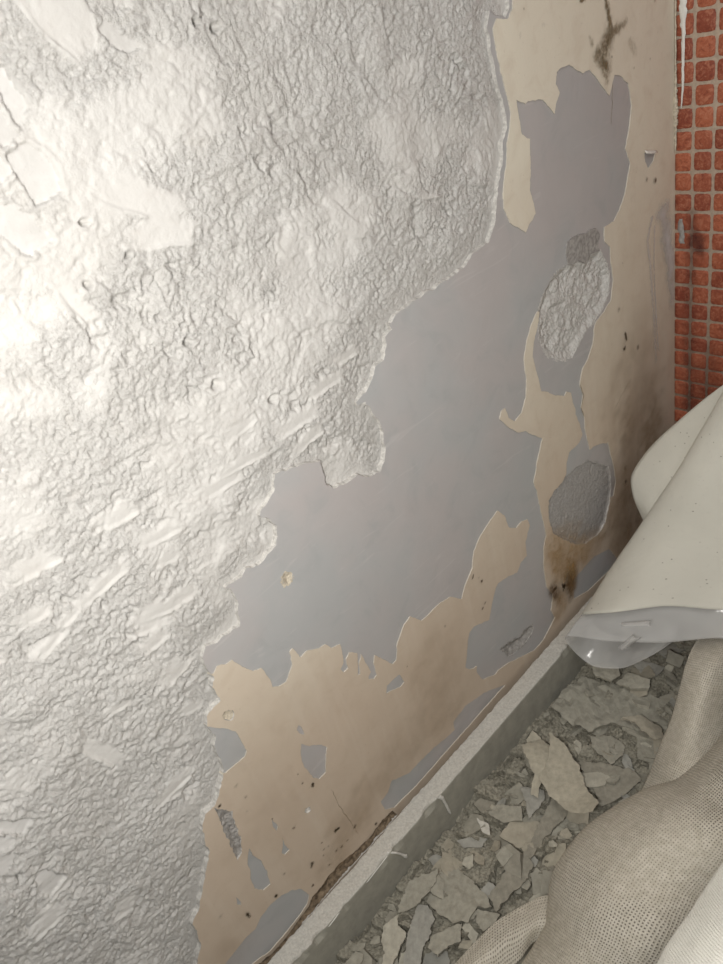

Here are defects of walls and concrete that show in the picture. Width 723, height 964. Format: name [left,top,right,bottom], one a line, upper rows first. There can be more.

spalling [0,0,505,964]
peeling [200,0,631,687]
water stain [596,0,621,69]
flaking render [344,727,662,964]